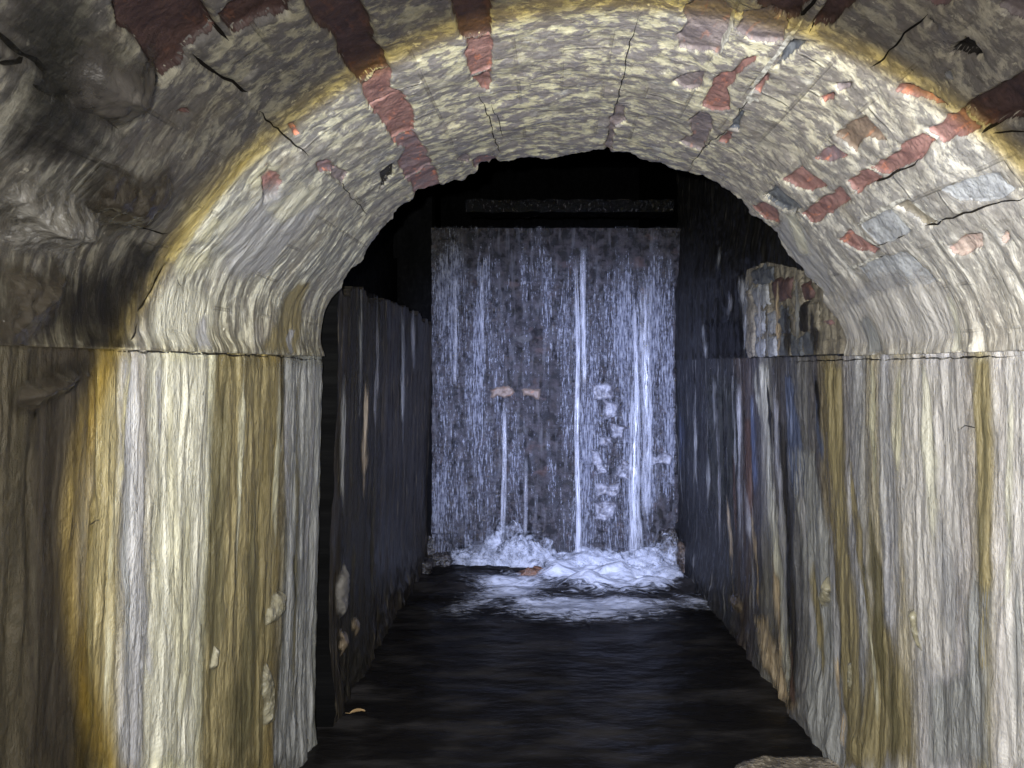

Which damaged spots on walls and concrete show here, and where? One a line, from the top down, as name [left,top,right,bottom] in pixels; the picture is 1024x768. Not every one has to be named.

spalling [111,0,289,82]
spalling [451,0,493,90]
crack [193,54,308,155]
spalling [304,0,439,192]
spalling [673,56,757,150]
spalling [753,71,1024,225]
crack [873,198,1024,257]
crack [93,265,321,361]
crack [793,354,1021,362]
damp [30,147,323,768]
damp [693,367,911,767]
damp [870,361,1024,765]